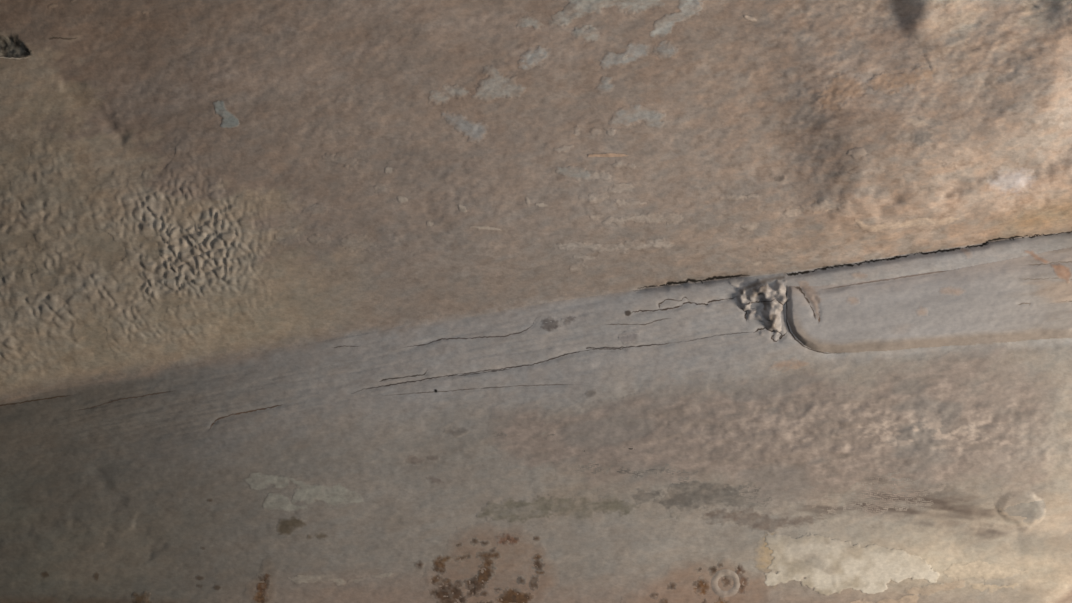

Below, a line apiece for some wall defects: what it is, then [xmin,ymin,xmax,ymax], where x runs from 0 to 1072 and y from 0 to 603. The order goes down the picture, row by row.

spalling [0,33,34,61]
crack [351,231,1072,396]
crack [0,391,173,411]
crack [209,404,284,430]
water stain [476,459,1036,589]
rust [413,522,561,603]
rust [620,557,778,603]